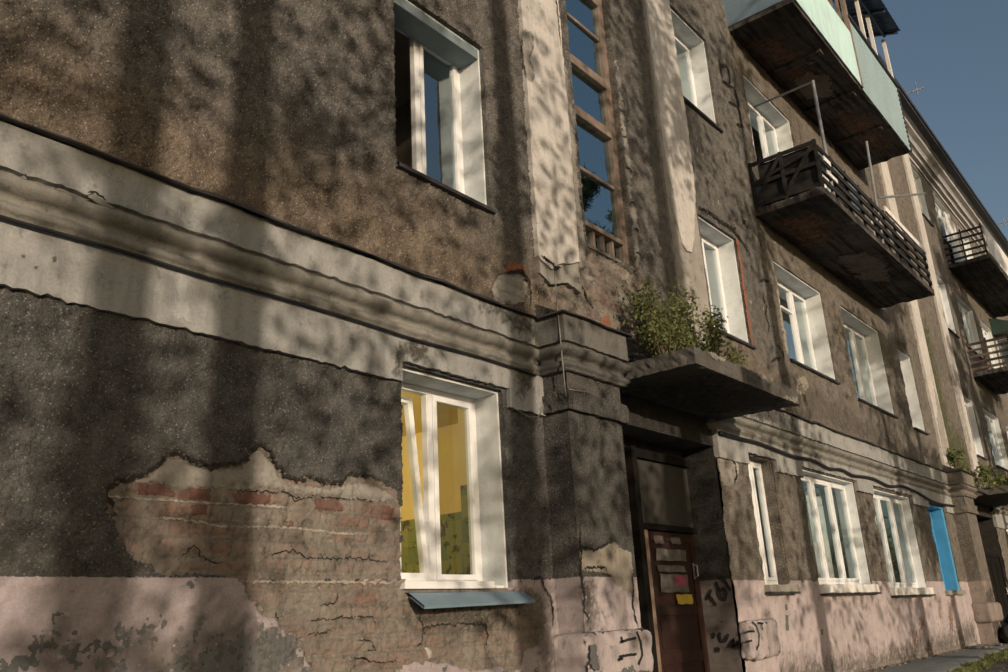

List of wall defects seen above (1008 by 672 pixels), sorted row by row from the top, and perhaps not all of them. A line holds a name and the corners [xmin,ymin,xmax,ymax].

flaking render [544,60,655,363]
crack [699,206,751,255]
flaking render [492,261,532,304]
crack [760,278,785,362]
flaking render [0,443,554,672]
flaking render [579,542,634,592]